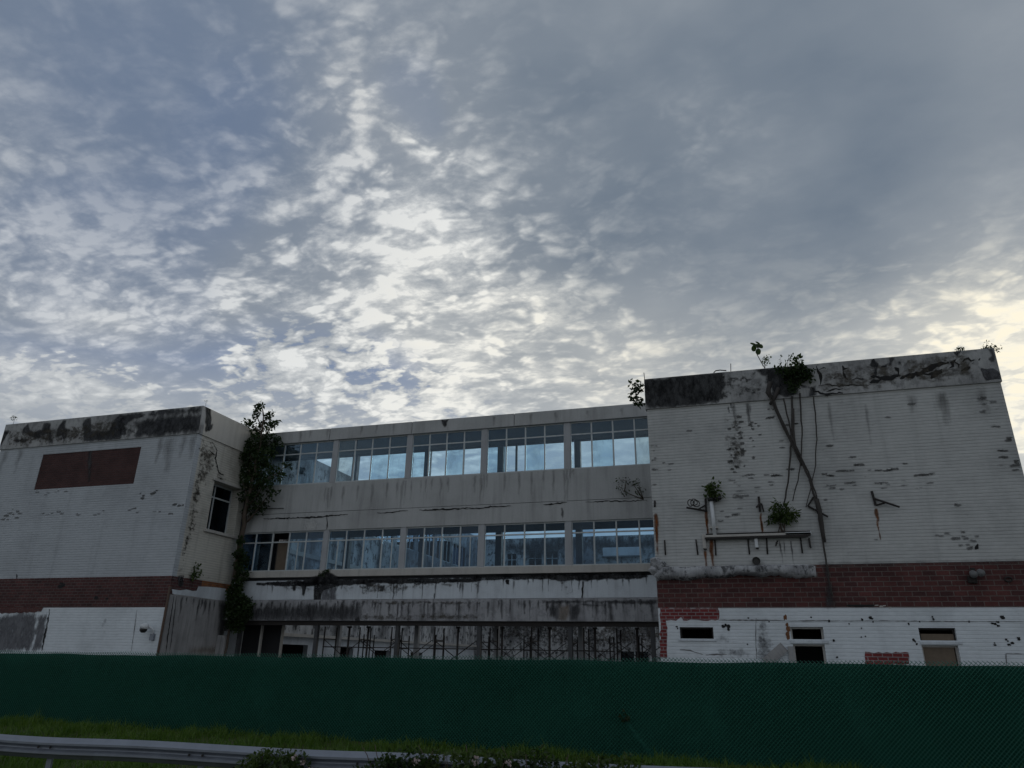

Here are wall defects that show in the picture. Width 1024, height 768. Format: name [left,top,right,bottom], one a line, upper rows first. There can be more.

damp [644,372,760,425]
damp [801,351,970,396]
crack [811,357,981,396]
damp [1,406,213,477]
crack [263,514,348,529]
crack [385,505,509,513]
crack [595,497,647,505]
corrosion [704,512,714,566]
damp [253,536,655,633]